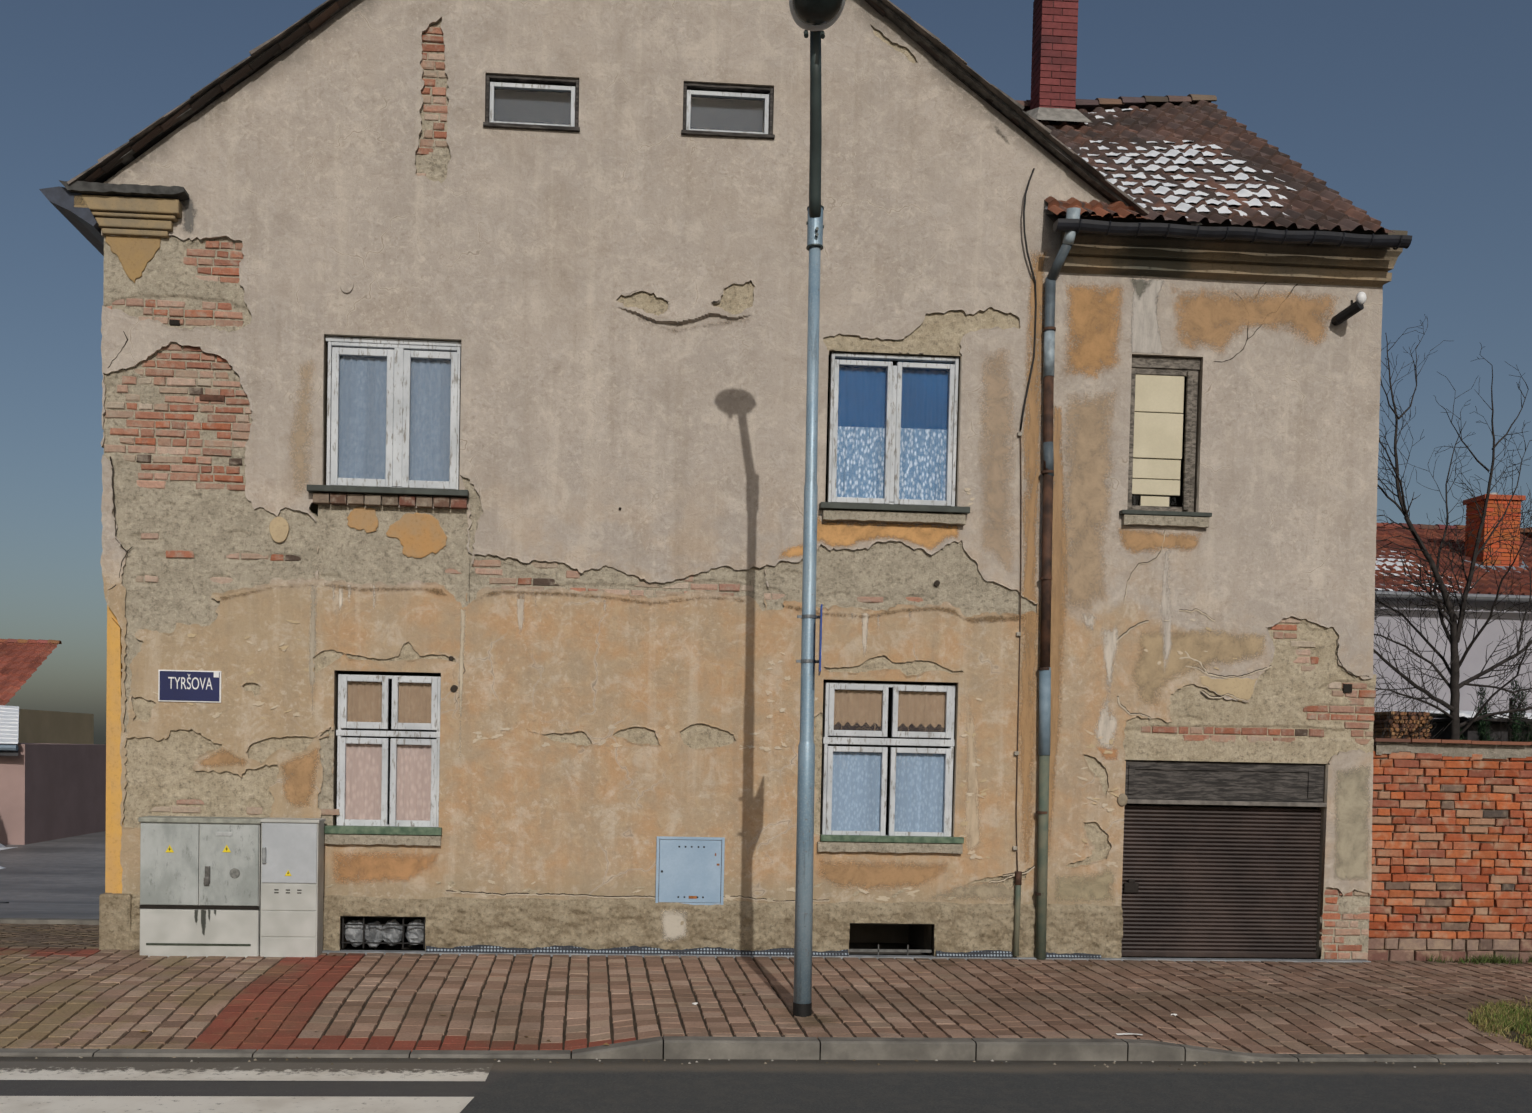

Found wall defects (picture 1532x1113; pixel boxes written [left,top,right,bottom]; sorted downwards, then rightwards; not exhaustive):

flaking render [412,15,453,184]
peeling [1175,292,1333,349]
flaking render [103,233,1039,836]
flaking render [1065,614,1376,869]
flaking render [1319,886,1370,960]